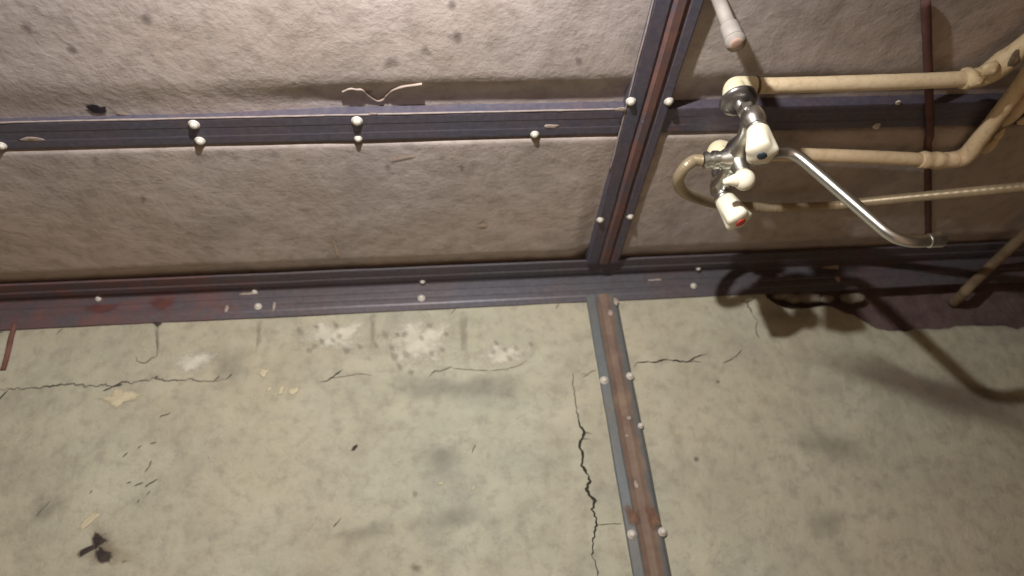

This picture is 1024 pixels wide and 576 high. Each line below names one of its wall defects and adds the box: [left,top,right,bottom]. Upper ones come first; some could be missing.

crack [0,331,232,399]
damp [175,353,217,372]
damp [306,322,361,349]
damp [390,321,448,361]
crack [430,361,526,376]
damp [477,345,524,364]
crack [634,297,760,367]
crack [572,370,621,576]